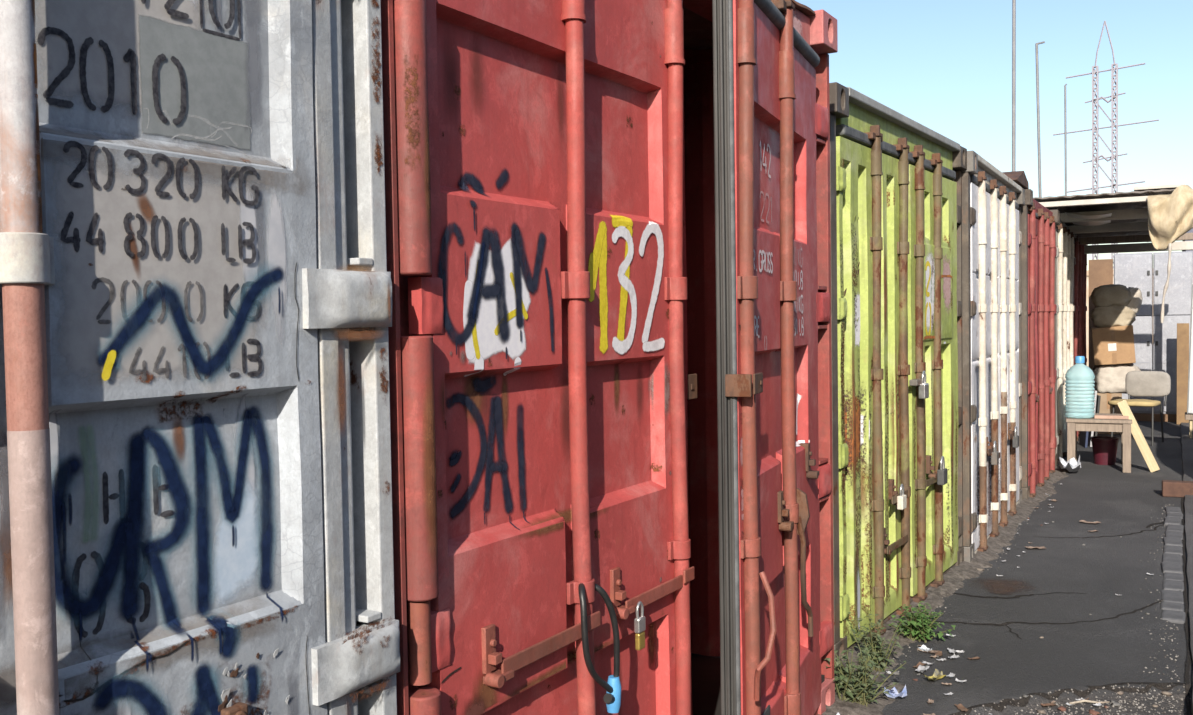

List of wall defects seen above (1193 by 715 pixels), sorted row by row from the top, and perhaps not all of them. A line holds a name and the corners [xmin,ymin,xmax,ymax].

rust [372,0,381,103]
rust [342,327,388,393]
rust [343,620,390,654]
crack [937,497,1192,715]